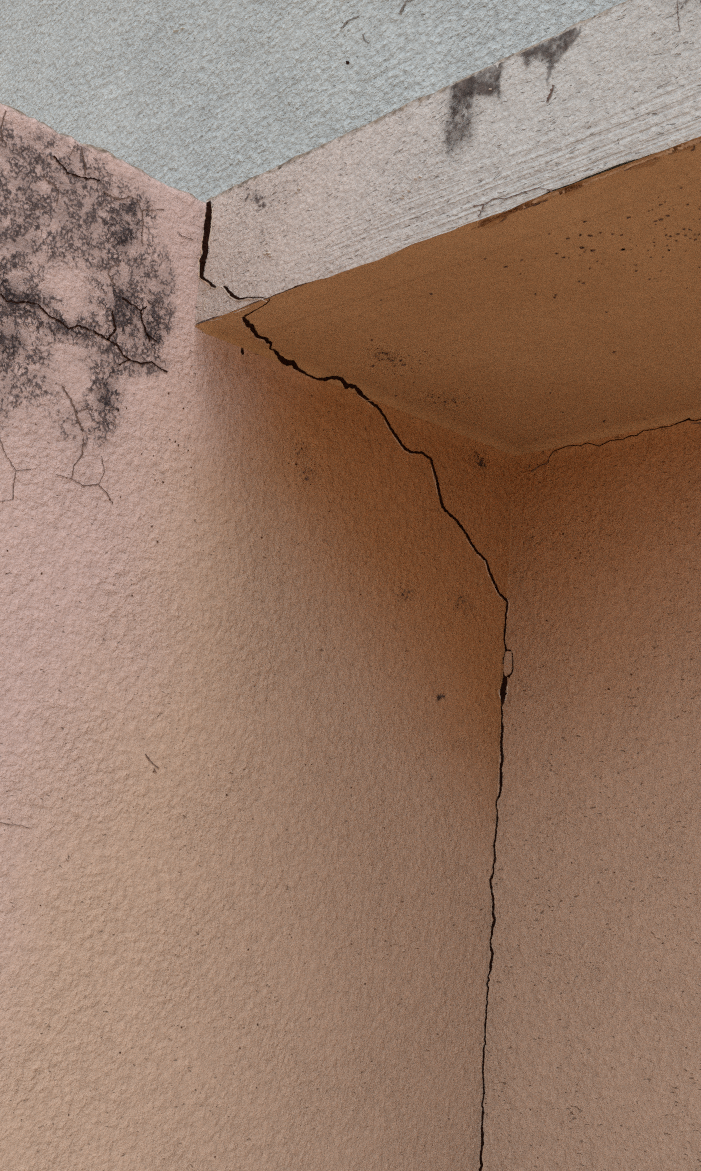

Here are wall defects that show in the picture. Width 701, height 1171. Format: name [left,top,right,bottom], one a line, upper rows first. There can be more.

damp [445,63,502,150]
damp [520,28,579,80]
crack [473,187,553,217]
crack [0,264,168,373]
damp [0,127,176,447]
crack [0,386,113,504]
crack [531,418,701,472]
crack [43,144,513,1171]